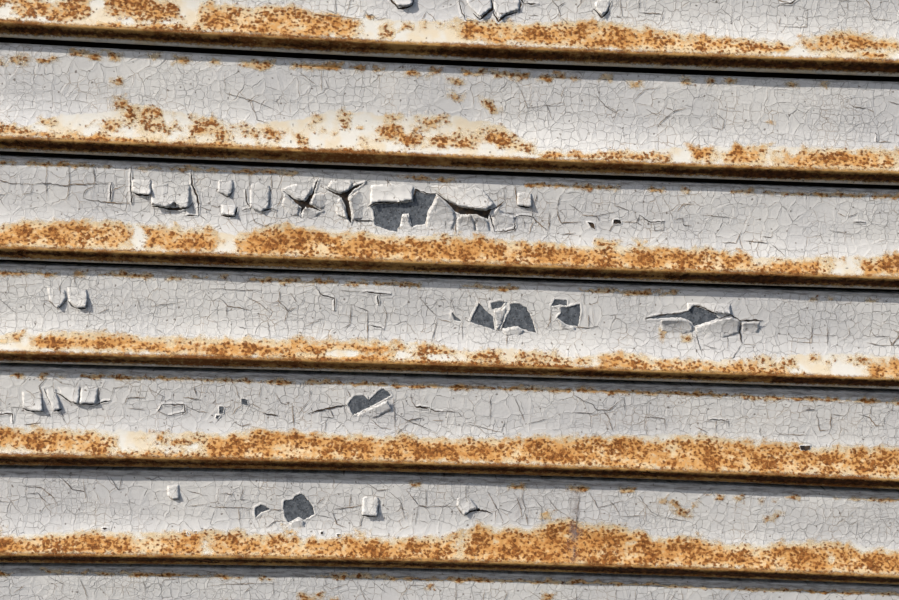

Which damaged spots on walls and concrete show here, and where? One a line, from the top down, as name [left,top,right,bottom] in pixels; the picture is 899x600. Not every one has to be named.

rust [0,0,899,103]
rust [0,96,899,200]
crack [0,167,134,204]
peeling [214,171,532,234]
crack [216,286,391,339]
peeling [431,297,599,346]
peeling [643,303,763,356]
crack [125,387,208,417]
crack [393,398,549,433]
rust [0,425,899,502]
peeling [167,484,387,539]
rust [0,510,899,600]